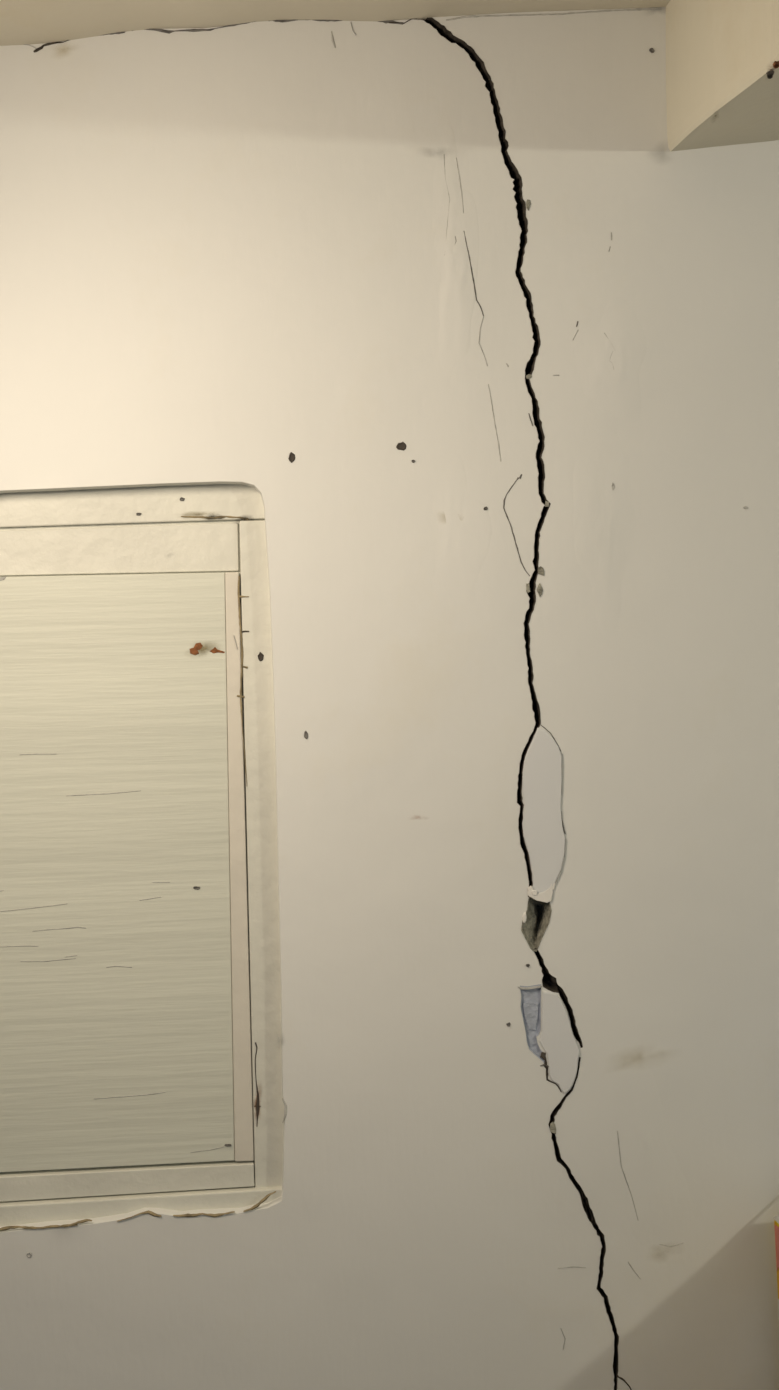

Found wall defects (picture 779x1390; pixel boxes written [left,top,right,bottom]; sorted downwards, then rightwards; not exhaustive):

crack [24,8,661,897]
crack [0,890,132,968]
peeling [521,727,566,952]
peeling [519,984,579,1094]
crack [534,948,641,1390]